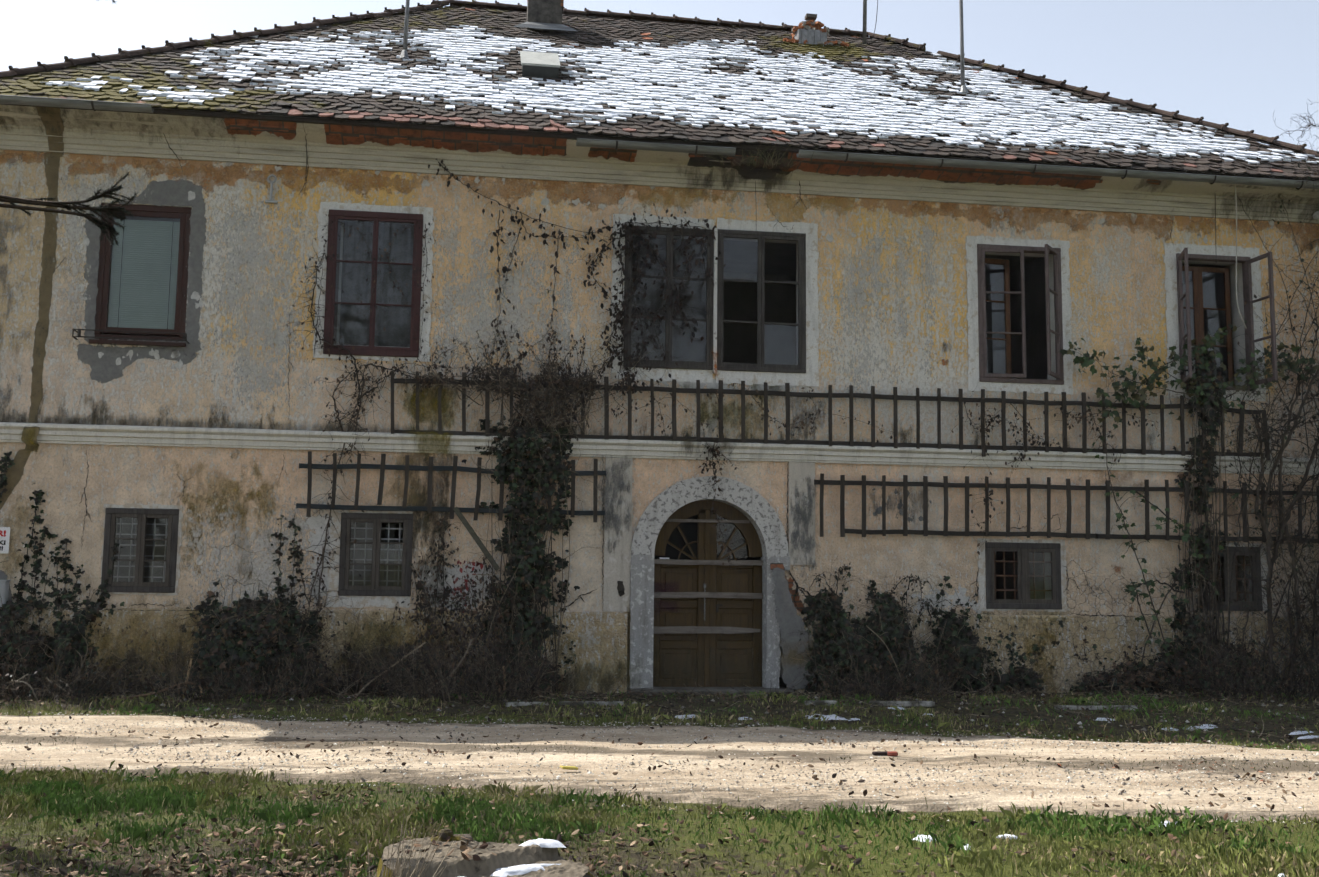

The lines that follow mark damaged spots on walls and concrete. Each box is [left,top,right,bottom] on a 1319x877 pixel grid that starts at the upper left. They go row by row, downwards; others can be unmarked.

flaking render [224,118,297,140]
flaking render [324,124,567,156]
flaking render [458,147,1103,222]
peeling [909,201,1274,244]
flaking render [53,160,430,383]
water stain [0,106,112,520]
flaking render [770,563,818,613]